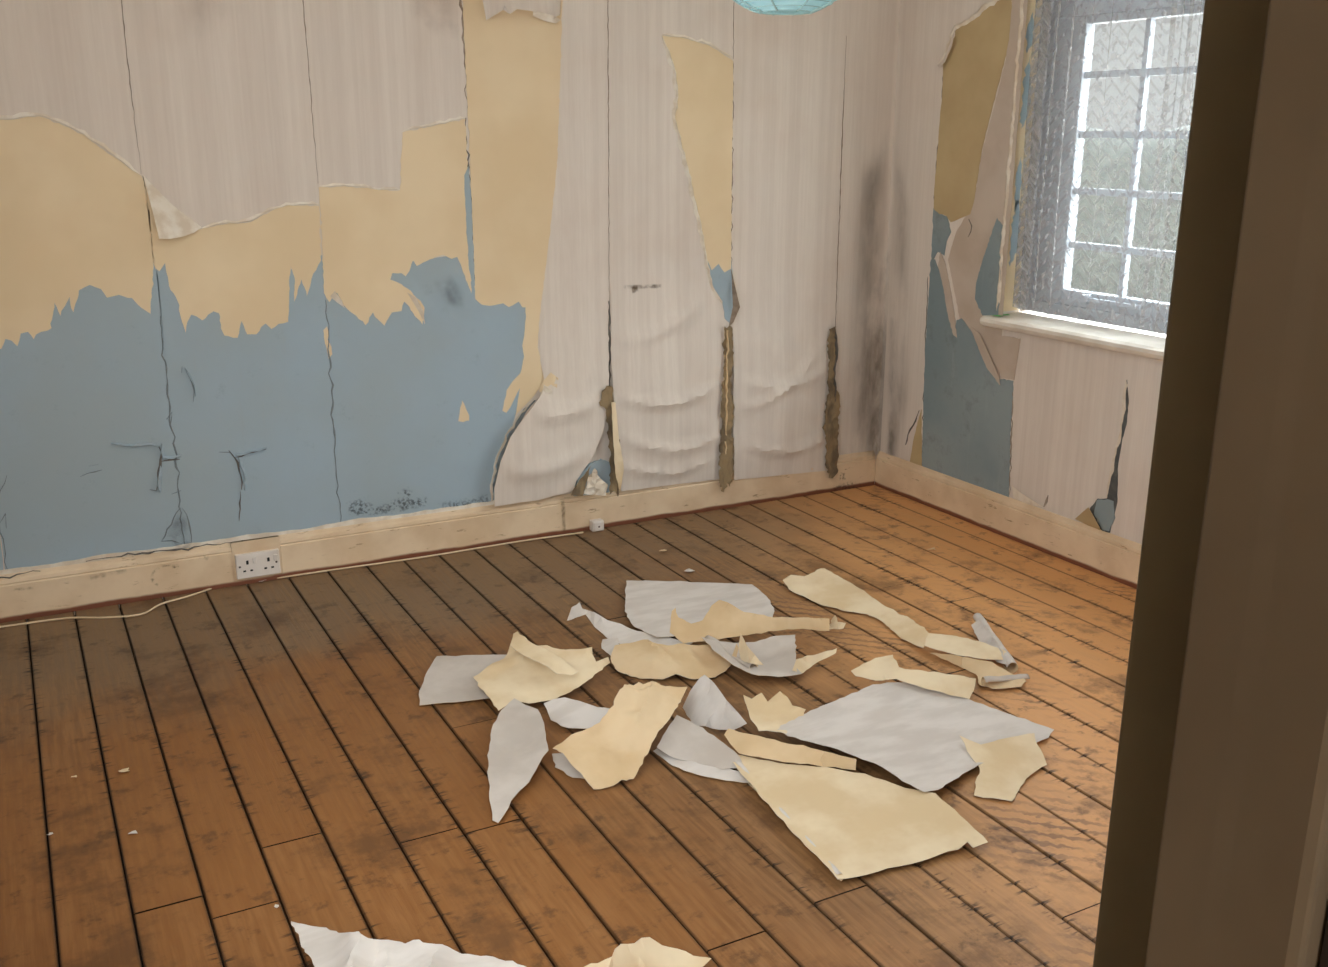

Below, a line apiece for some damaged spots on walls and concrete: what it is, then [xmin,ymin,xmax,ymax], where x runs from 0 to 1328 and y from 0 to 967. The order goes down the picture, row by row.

peeling [938,252,957,337]
crack [80,316,267,562]
peeling [458,401,469,422]